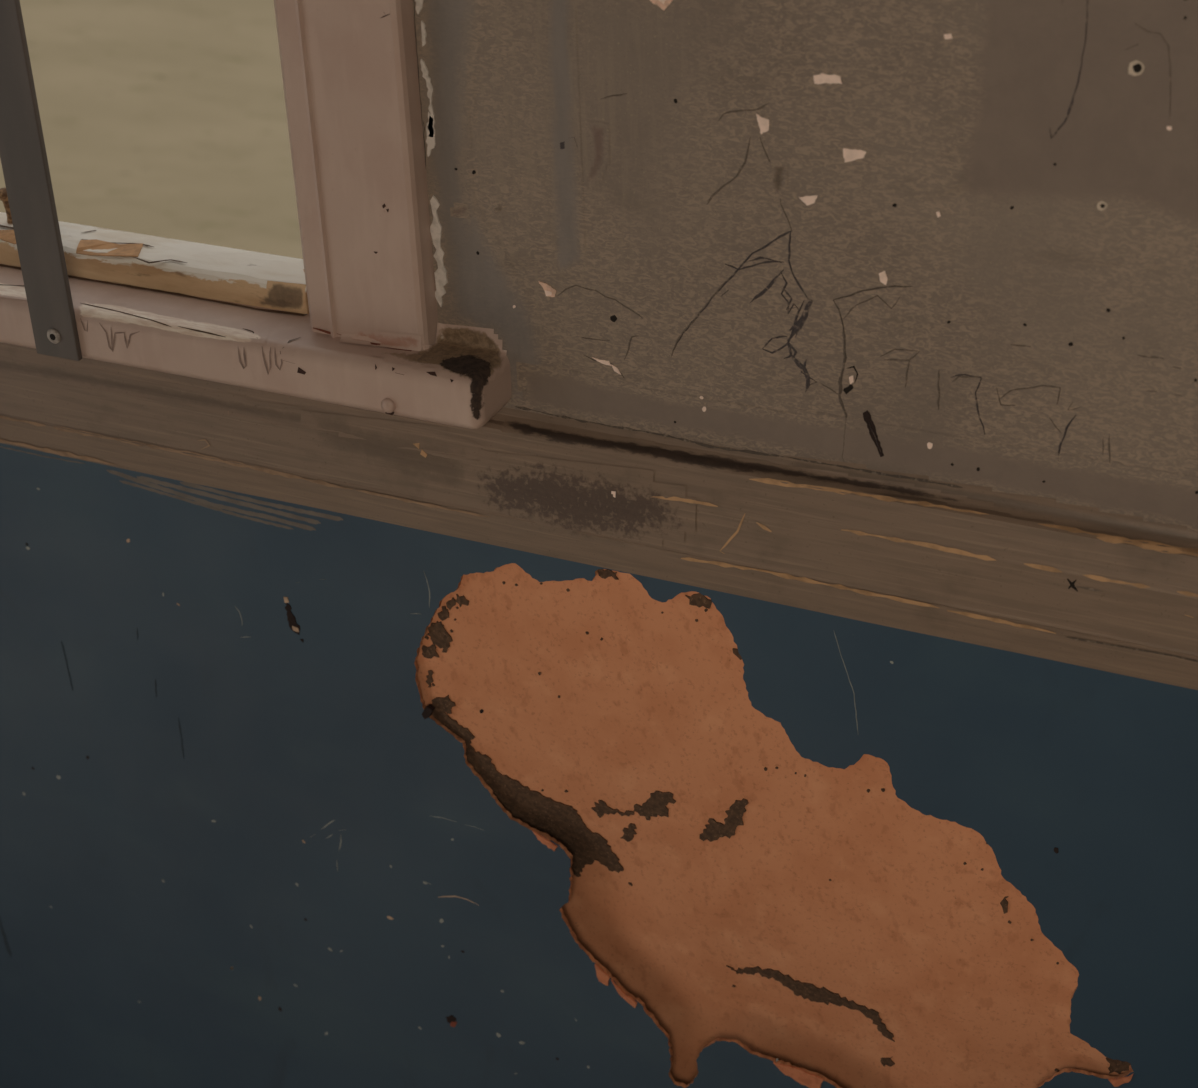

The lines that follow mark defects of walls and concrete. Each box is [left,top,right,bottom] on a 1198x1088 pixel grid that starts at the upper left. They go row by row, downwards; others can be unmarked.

peeling [417,557,1134,1088]